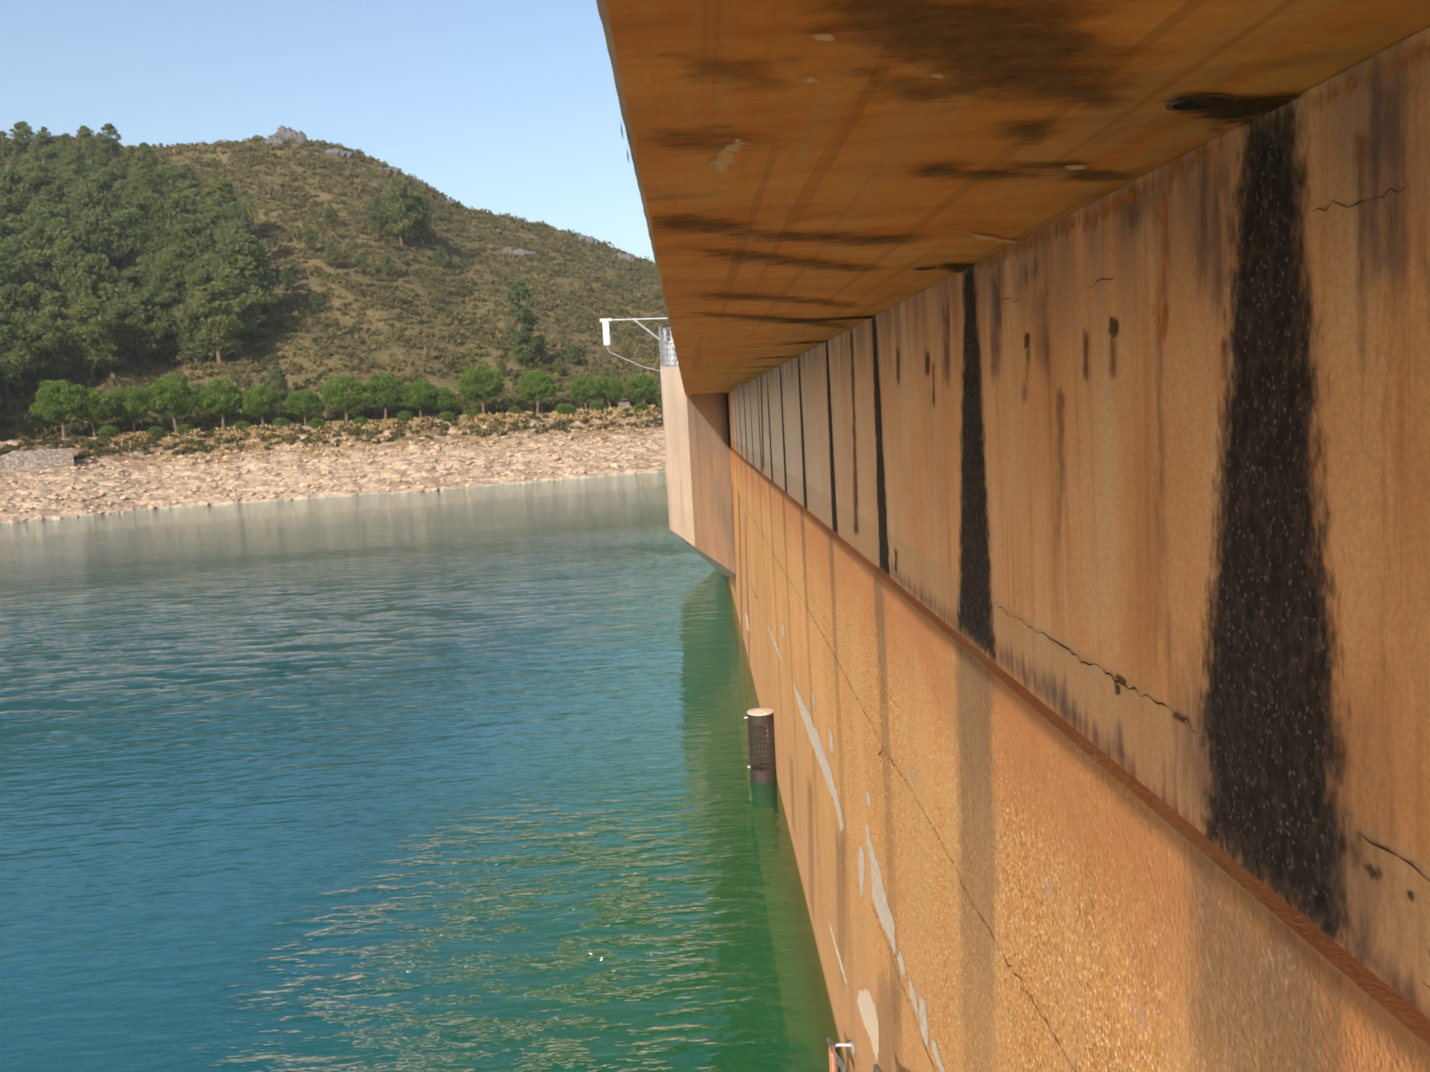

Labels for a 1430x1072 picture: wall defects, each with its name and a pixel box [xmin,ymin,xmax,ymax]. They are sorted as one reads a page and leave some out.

leakage [820,0,1124,108]
leakage [652,214,923,271]
leakage [915,164,1127,181]
leakage [702,294,936,608]
leakage [925,265,1134,777]
leakage [1174,95,1357,940]
crack [995,601,1198,733]
peeling [792,681,844,832]
peeling [828,921,879,1063]
peeling [858,824,945,1072]